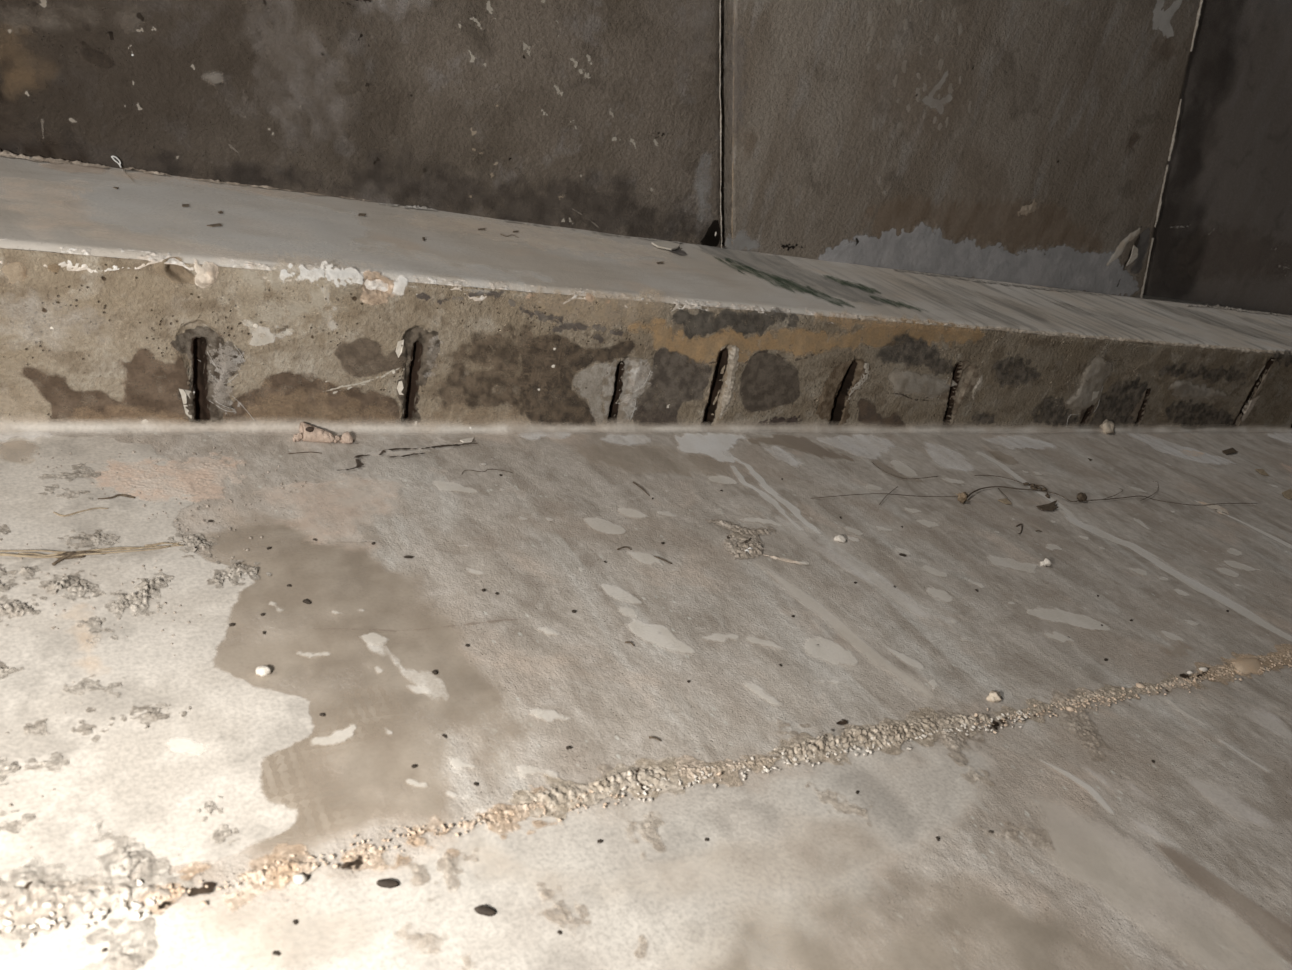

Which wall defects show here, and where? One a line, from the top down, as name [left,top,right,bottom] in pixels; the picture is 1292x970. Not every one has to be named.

peeling [1153,0,1182,38]
spalling [1190,0,1203,51]
spalling [0,238,1292,432]
damp [212,522,521,850]
crack [1165,671,1217,692]
crack [808,719,847,745]
crack [987,714,1036,732]
crack [338,855,363,870]
crack [158,882,215,909]